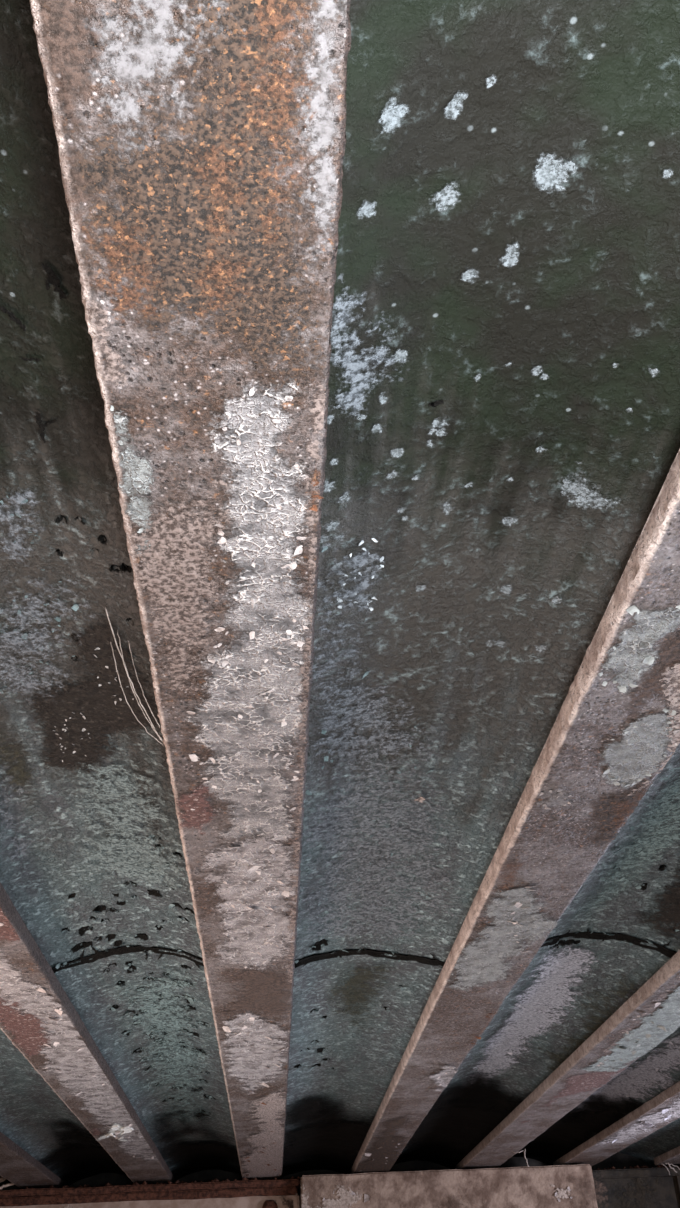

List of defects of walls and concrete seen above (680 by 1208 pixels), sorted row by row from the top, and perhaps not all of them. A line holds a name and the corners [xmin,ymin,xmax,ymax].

corrosion [38,0,344,387]
peeling [598,605,680,693]
water stain [0,569,184,890]
peeling [599,708,680,789]
crack [52,945,204,976]
crack [294,947,445,968]
crack [540,929,677,958]
water stain [394,948,598,1169]
water stain [26,1122,134,1186]